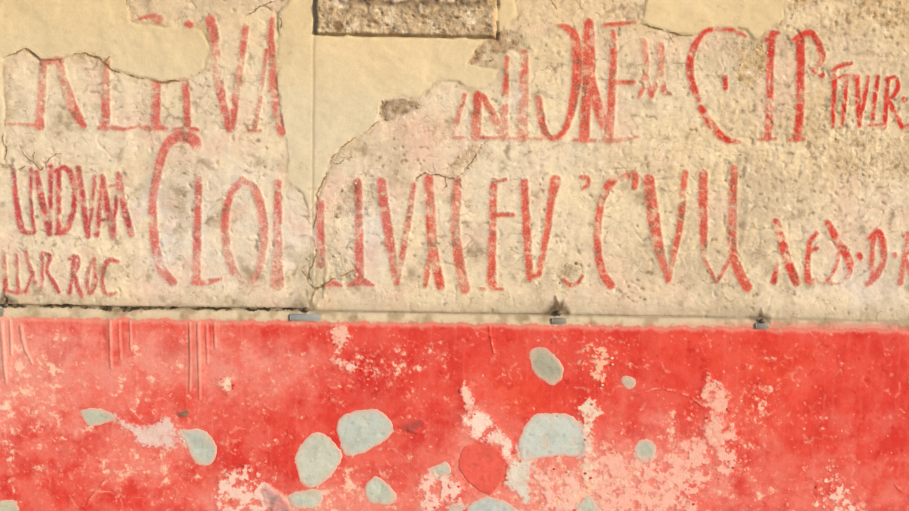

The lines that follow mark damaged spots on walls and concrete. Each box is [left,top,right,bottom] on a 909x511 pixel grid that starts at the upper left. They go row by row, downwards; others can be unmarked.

spalling [465,26,536,68]
spalling [375,96,425,123]
spalling [440,142,488,175]
crack [0,119,379,314]
peeling [321,318,367,380]
peeling [211,372,240,397]
peeling [108,408,190,456]
peeling [455,337,747,511]
peeling [209,458,291,511]
peeling [411,467,472,511]